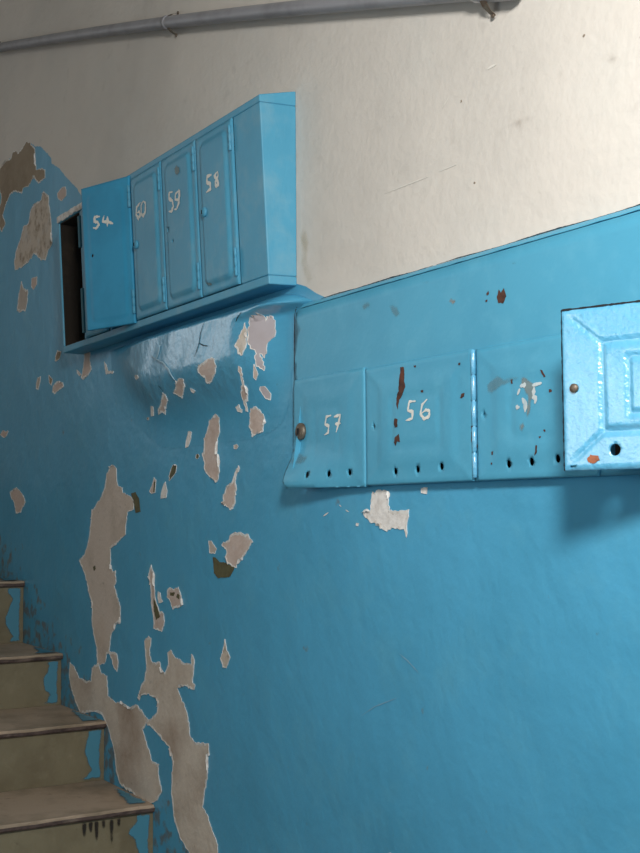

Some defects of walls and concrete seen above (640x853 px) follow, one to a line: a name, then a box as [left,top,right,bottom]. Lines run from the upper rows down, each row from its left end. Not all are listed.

peeling [0,141,67,270]
peeling [17,276,37,313]
corrosion [485,288,506,303]
peeling [234,313,276,437]
corrosion [394,367,405,446]
peeling [196,414,220,482]
peeling [10,487,26,514]
peeling [221,465,240,510]
peeling [356,489,409,537]
peeling [208,532,253,578]
peeling [69,464,218,853]